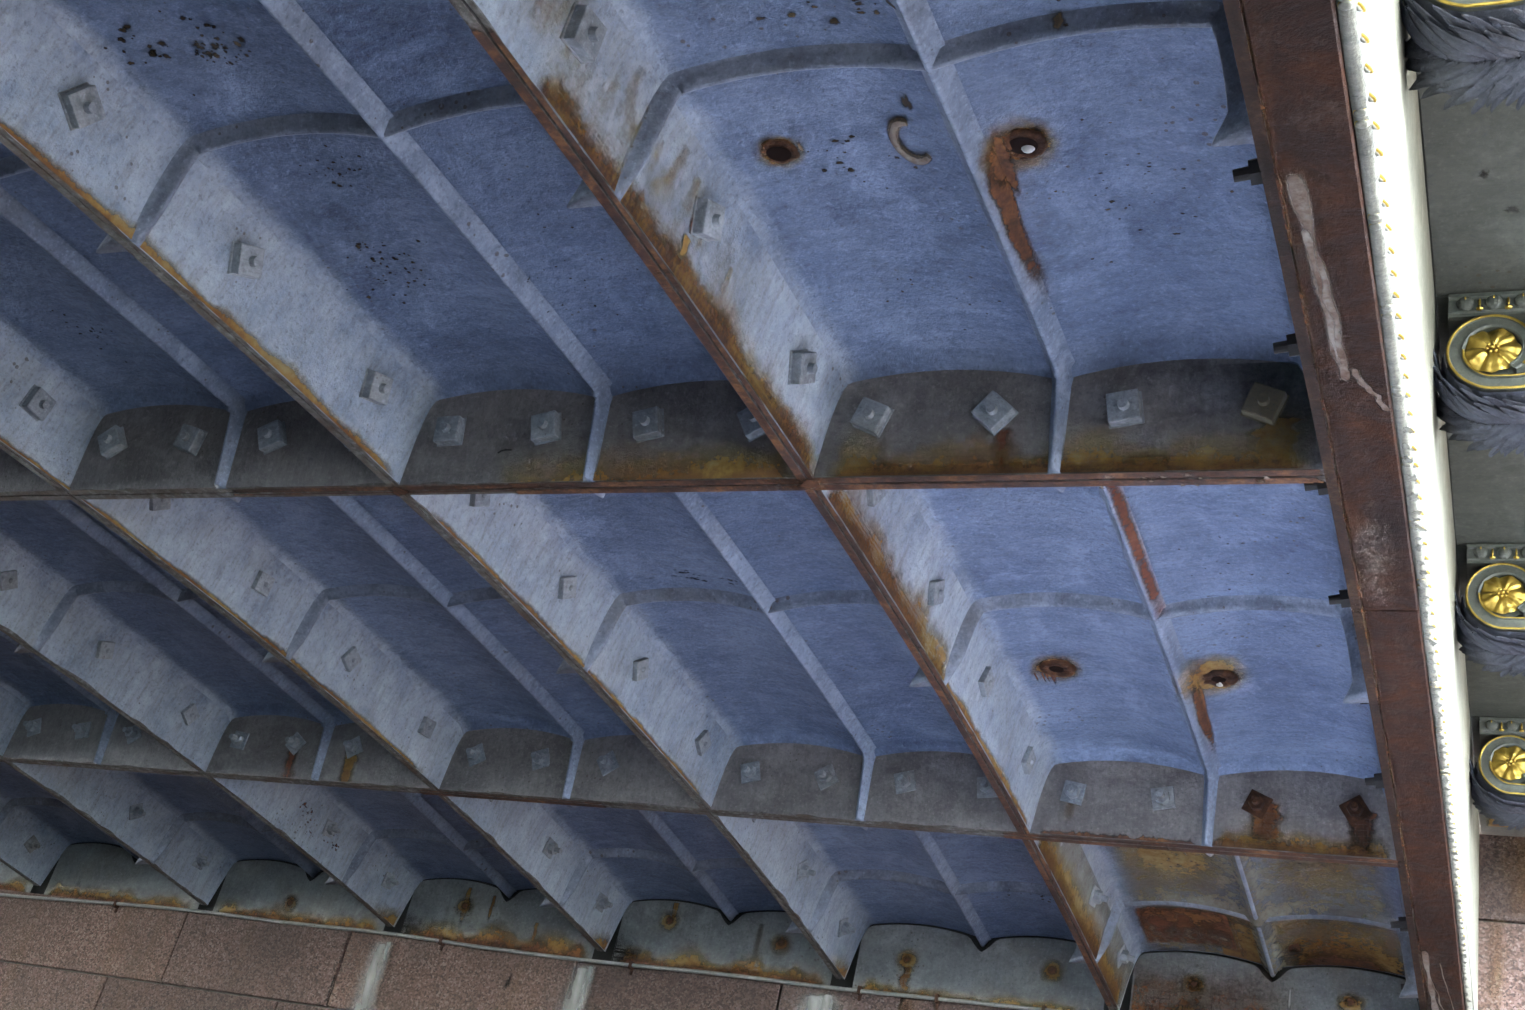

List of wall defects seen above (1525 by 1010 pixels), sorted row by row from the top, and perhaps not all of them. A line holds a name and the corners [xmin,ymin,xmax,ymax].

rust [104,25,171,65]
rust [180,16,251,65]
rust [807,135,866,182]
rust [510,77,815,482]
rust [827,428,1426,1010]